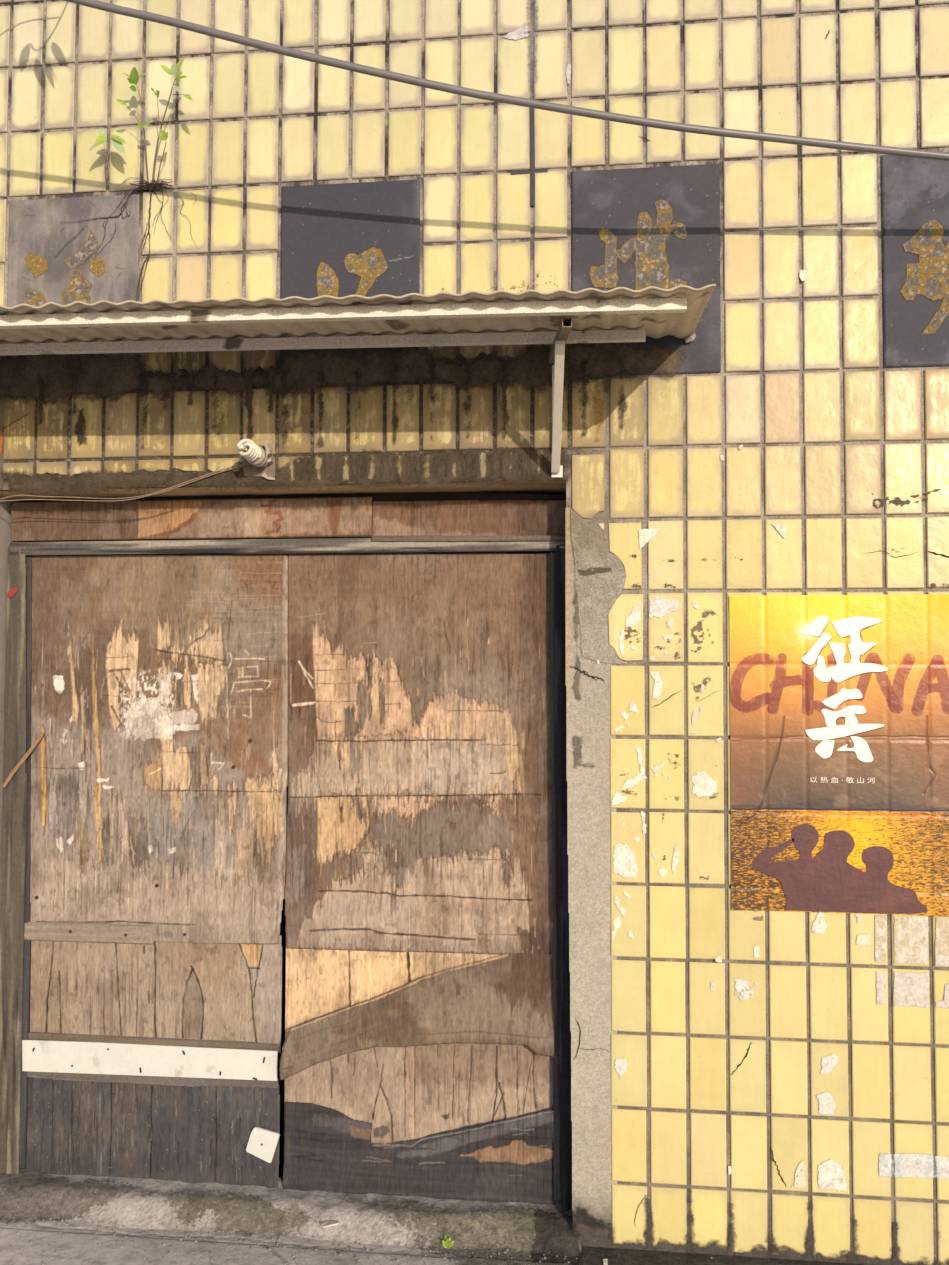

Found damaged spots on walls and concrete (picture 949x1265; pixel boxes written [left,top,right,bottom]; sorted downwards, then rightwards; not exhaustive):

leakage [0,339,686,493]
spalling [570,509,636,664]
crack [569,666,604,681]
peeling [612,792,627,805]
leakage [572,1191,949,1265]